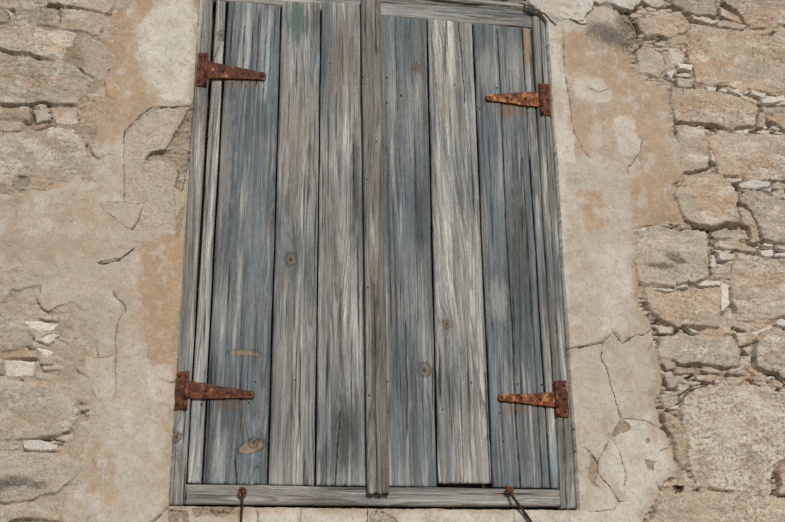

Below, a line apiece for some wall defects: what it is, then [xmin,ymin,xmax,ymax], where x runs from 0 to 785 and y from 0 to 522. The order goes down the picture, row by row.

flaking render [100,106,193,238]
crack [123,106,192,166]
crack [93,292,126,394]
crack [569,331,656,427]
crack [588,442,626,511]